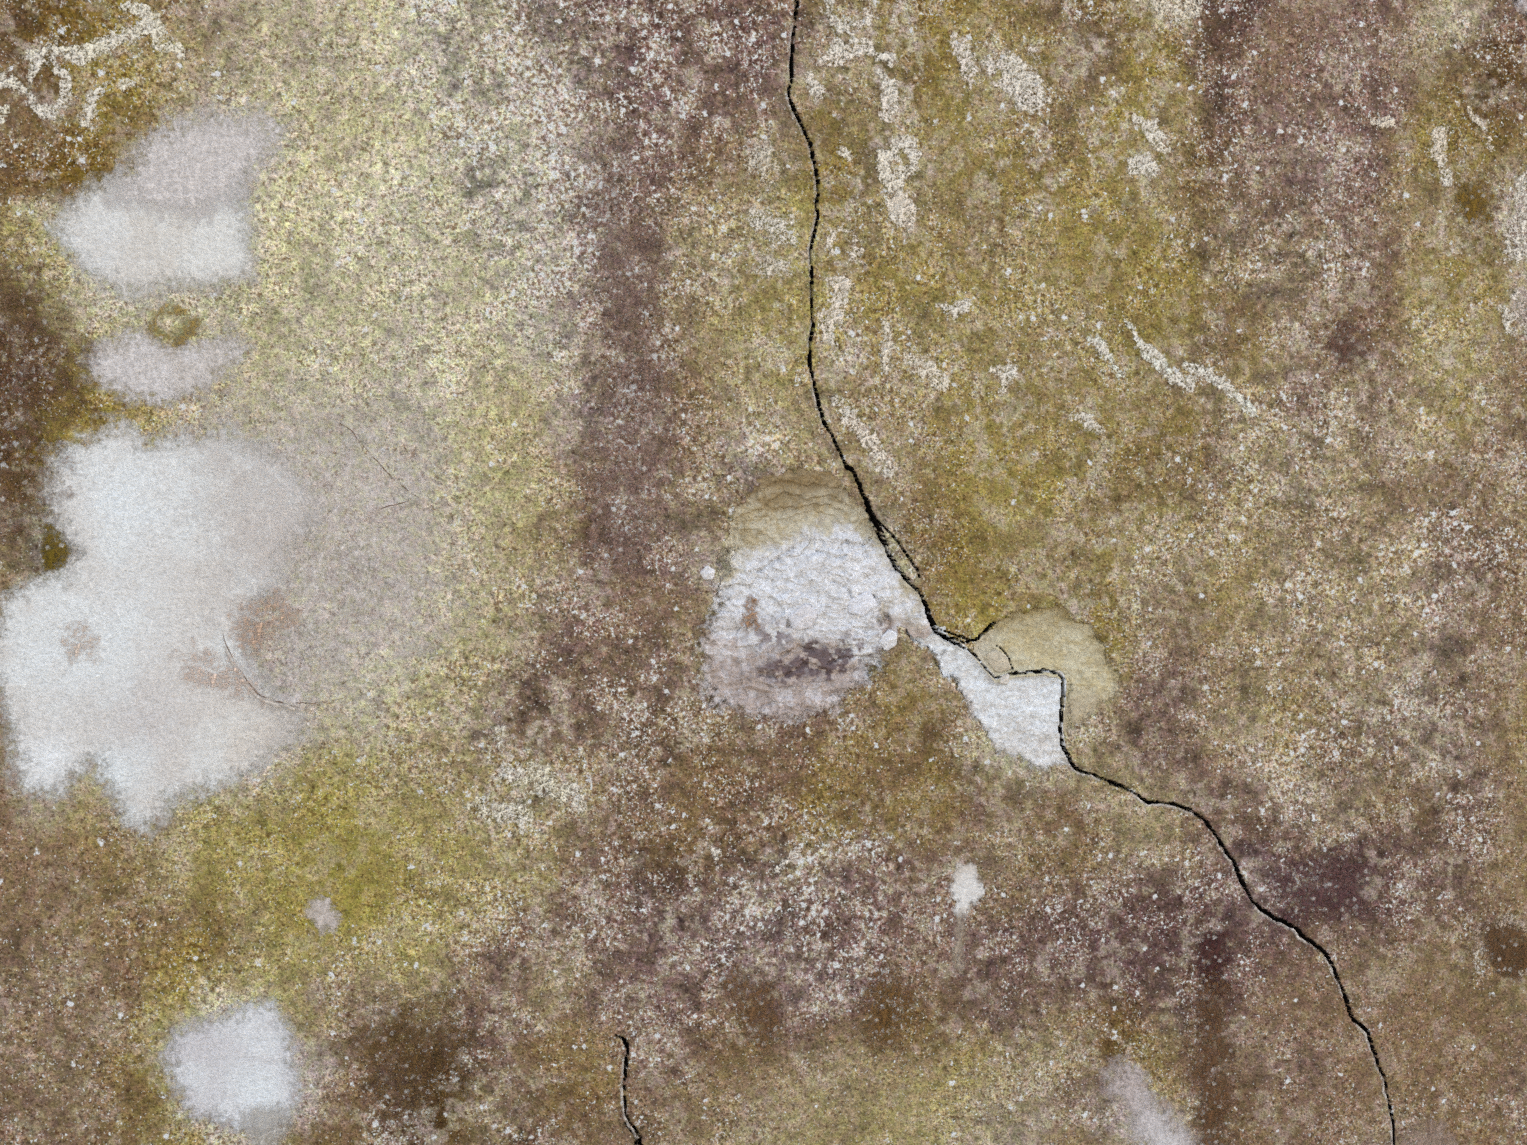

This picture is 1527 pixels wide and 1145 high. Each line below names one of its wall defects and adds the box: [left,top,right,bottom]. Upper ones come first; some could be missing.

spalling [1511,0,1527,14]
water stain [149,303,201,348]
spalling [697,467,1120,770]
crack [787,1,1395,1145]
crack [616,1035,643,1145]